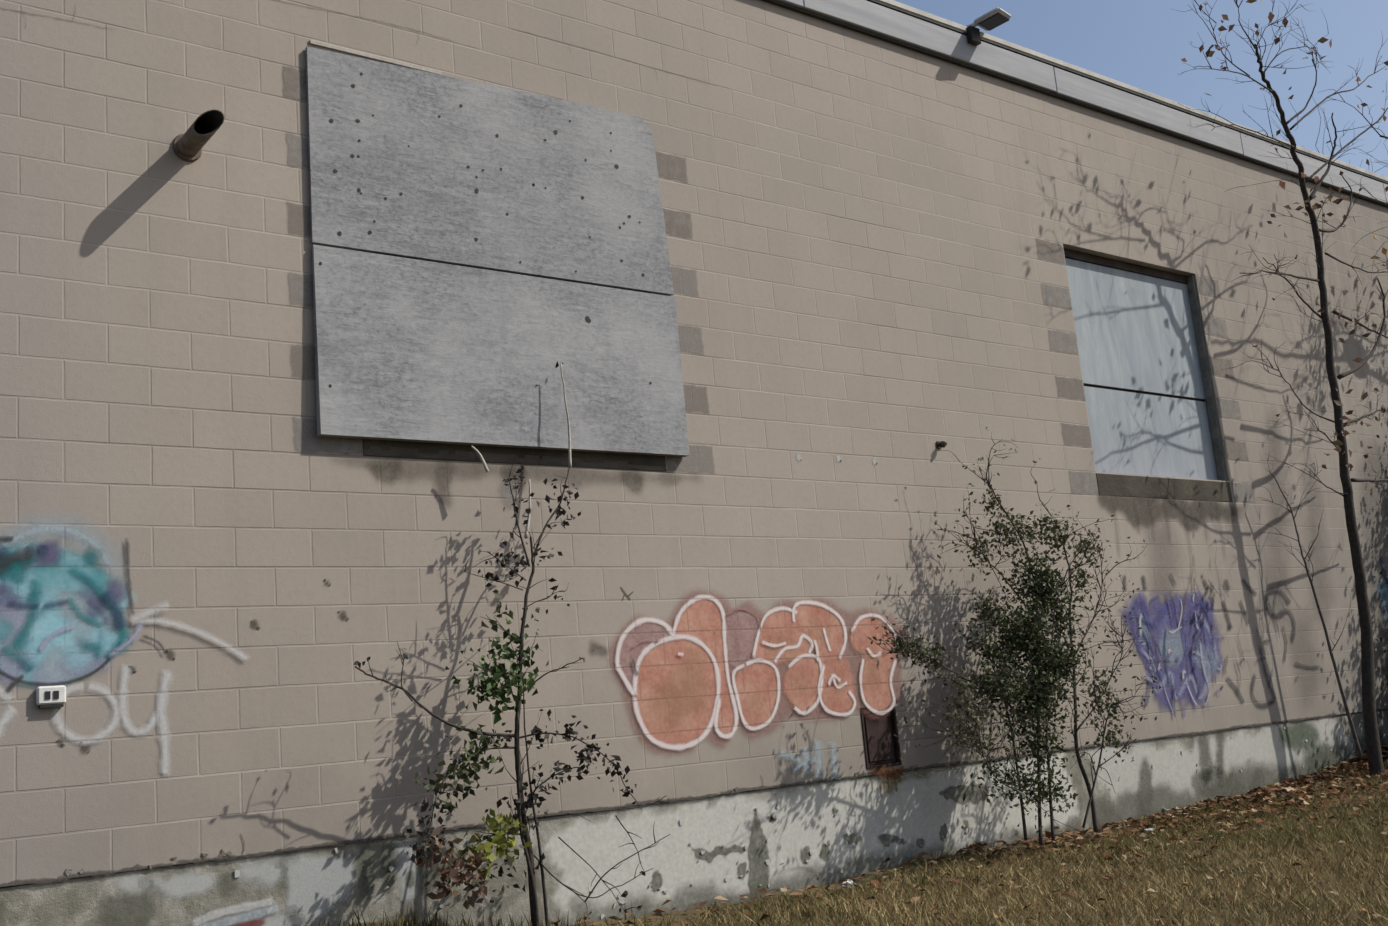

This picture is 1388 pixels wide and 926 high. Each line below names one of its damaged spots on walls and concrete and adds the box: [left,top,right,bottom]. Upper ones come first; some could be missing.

leakage [1100,492,1238,529]